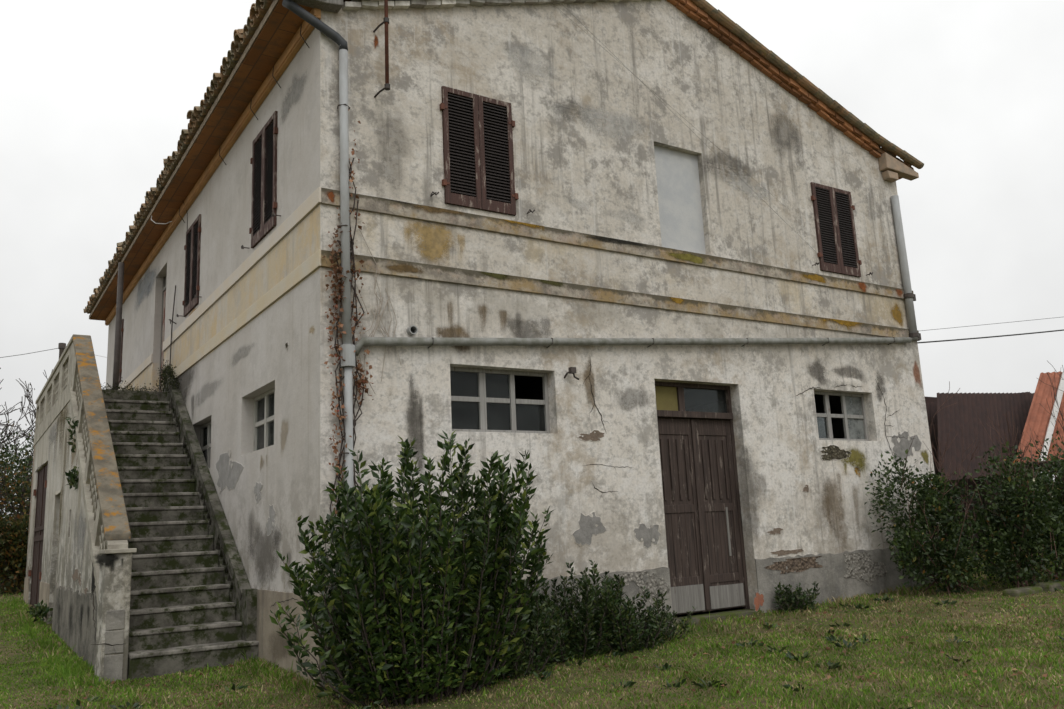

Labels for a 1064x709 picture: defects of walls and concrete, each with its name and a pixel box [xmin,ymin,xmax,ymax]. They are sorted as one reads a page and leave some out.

damp [439,328,468,351]
damp [501,312,540,338]
crack [585,360,609,434]
damp [50,407,76,532]
spalling [820,444,851,461]
peeling [891,430,922,465]
spalling [764,549,823,574]
spalling [844,552,888,586]